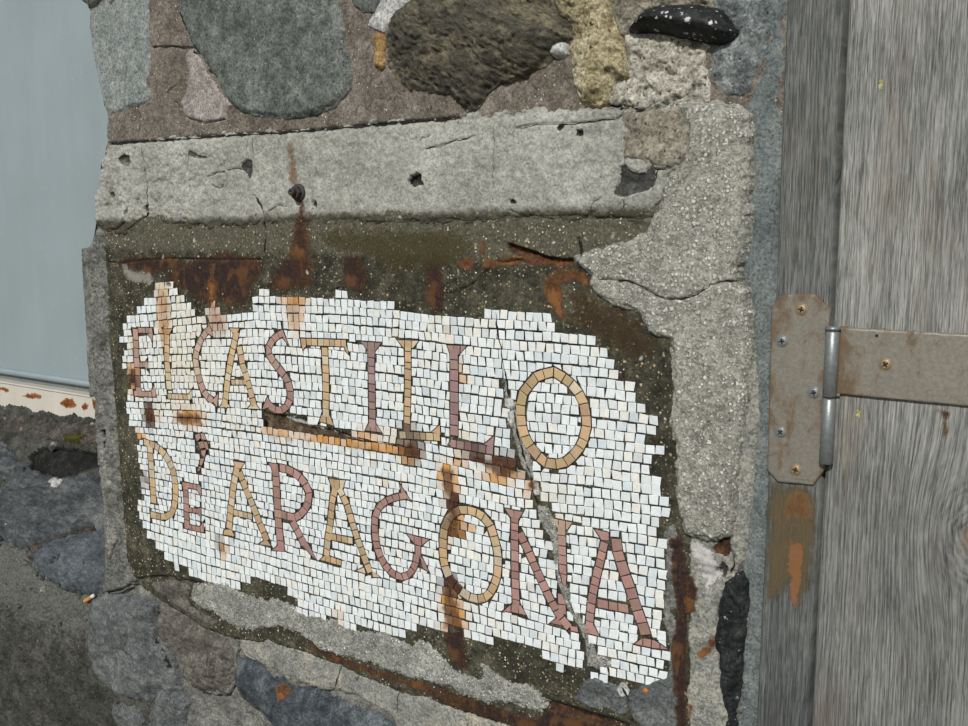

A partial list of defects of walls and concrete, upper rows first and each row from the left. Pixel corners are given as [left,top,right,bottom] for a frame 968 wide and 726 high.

spalling [614,100,689,197]
corrosion [119,252,263,306]
corrosion [273,201,312,291]
corrosion [424,240,588,318]
crack [598,278,739,300]
crack [351,268,638,726]
spalling [713,537,731,577]
corrosion [445,630,466,669]
corrosion [312,645,617,726]
corrosion [669,535,716,726]